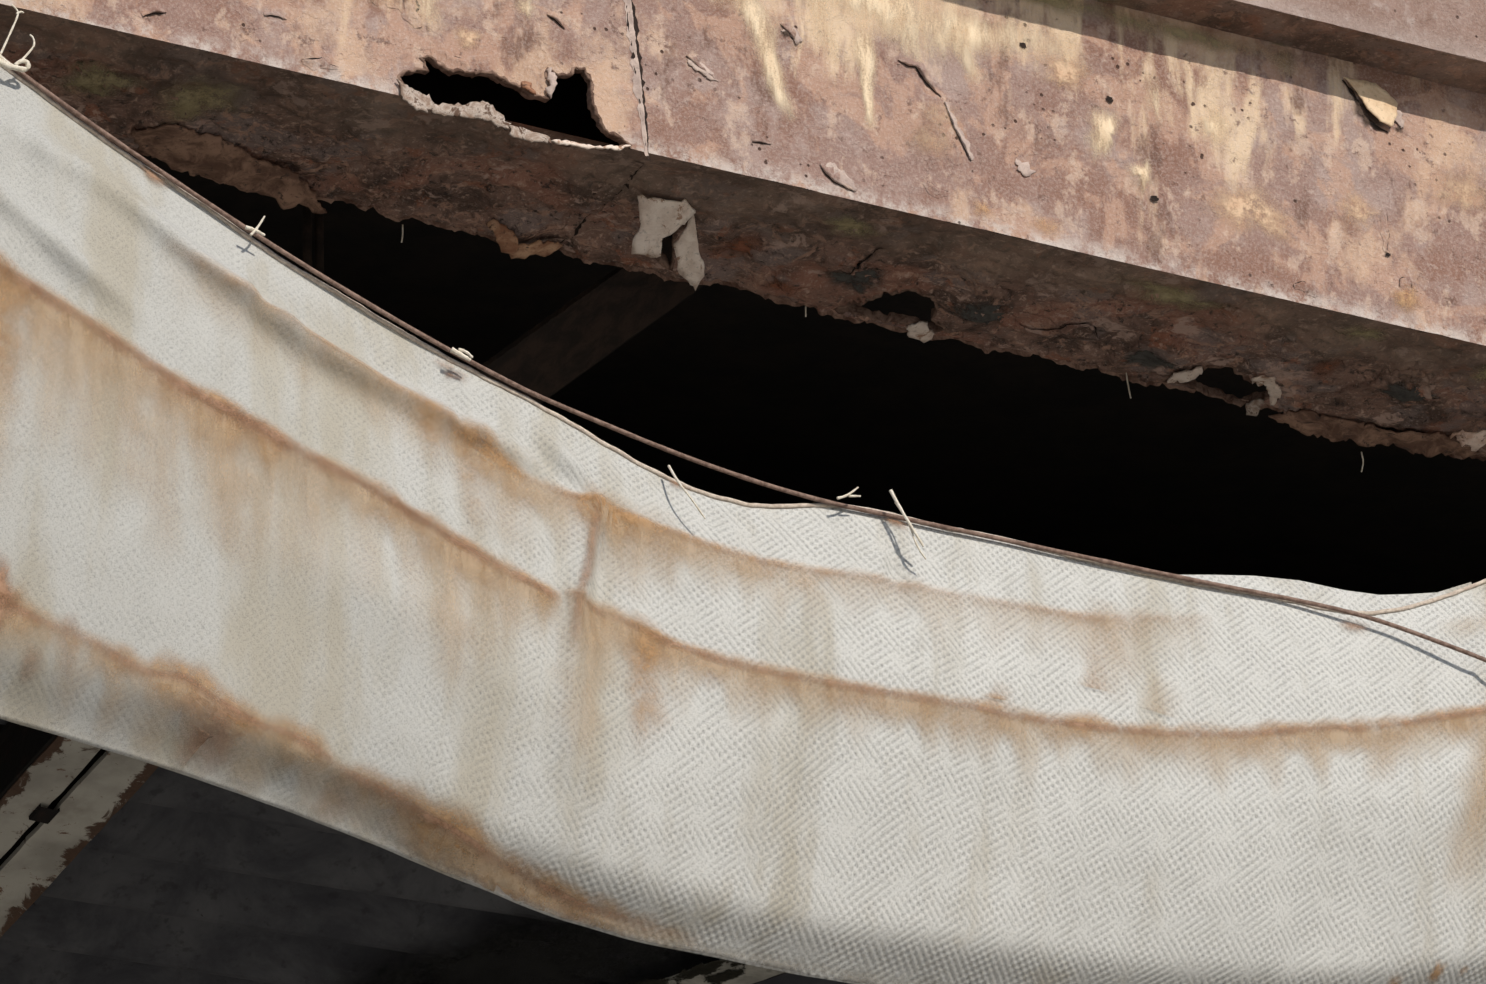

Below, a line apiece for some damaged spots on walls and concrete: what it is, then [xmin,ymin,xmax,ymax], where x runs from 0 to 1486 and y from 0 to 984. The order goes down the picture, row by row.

peeling [131,124,327,214]
peeling [396,79,631,151]
crack [547,0,650,243]
rust [1092,114,1115,151]
peeling [1342,77,1405,133]
peeling [486,219,563,259]
peeling [631,195,704,291]
rust [1217,190,1283,234]
rust [0,258,290,474]
peeling [1245,375,1486,460]
rust [319,457,553,606]
rust [575,493,720,578]